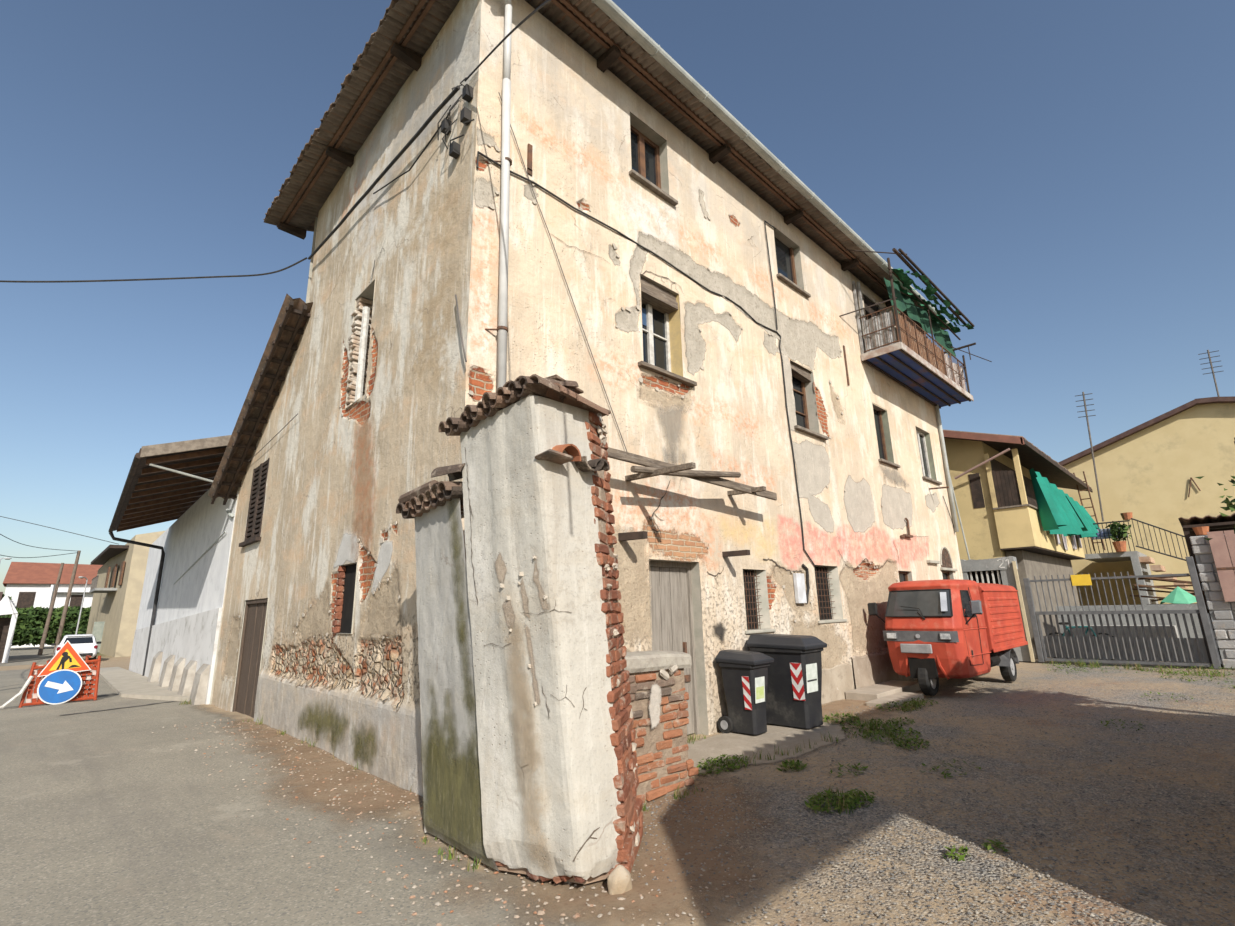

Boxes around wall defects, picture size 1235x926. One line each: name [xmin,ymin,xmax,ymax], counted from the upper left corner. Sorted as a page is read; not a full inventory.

flaking render [339,328,378,426]
peeling [609,232,843,439]
flaking render [357,521,397,602]
flaking render [271,573,404,712]
crack [542,687,587,719]